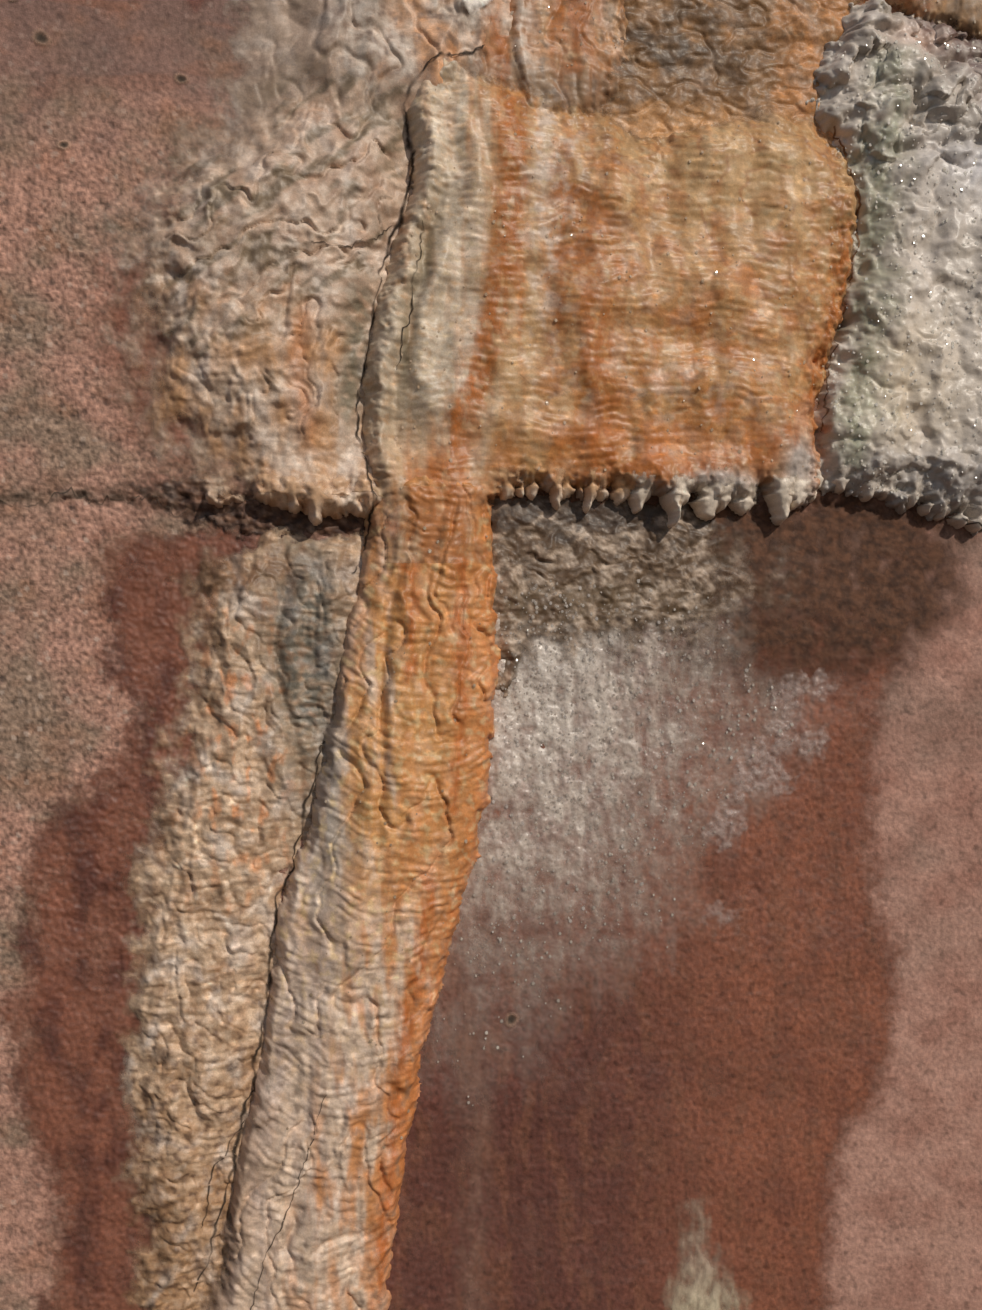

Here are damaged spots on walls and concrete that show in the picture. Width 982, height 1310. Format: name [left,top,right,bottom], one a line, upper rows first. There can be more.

crack [0,487,195,517]
damp [2,527,259,1310]
crack [194,741,325,1310]
crack [311,44,485,573]
rust [392,885,434,1120]
rust [457,561,469,709]
rust [436,102,521,486]
damp [385,488,959,1310]